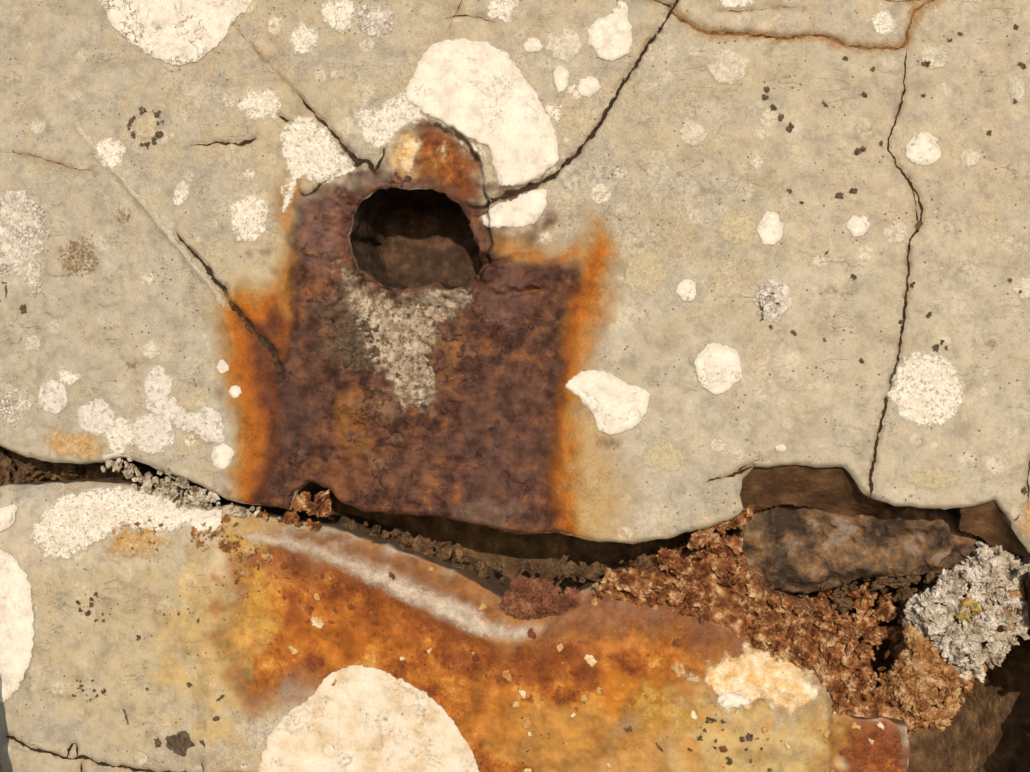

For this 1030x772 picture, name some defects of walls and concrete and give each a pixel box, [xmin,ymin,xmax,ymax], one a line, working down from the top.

crack [195,138,256,146]
crack [277,97,386,196]
crack [469,0,934,497]
crack [176,232,280,367]
corrosion [222,130,613,539]
spalling [740,465,881,518]
spalling [959,501,1030,557]
corrosion [221,522,753,772]
spalling [672,642,819,715]
corrosion [839,722,907,772]